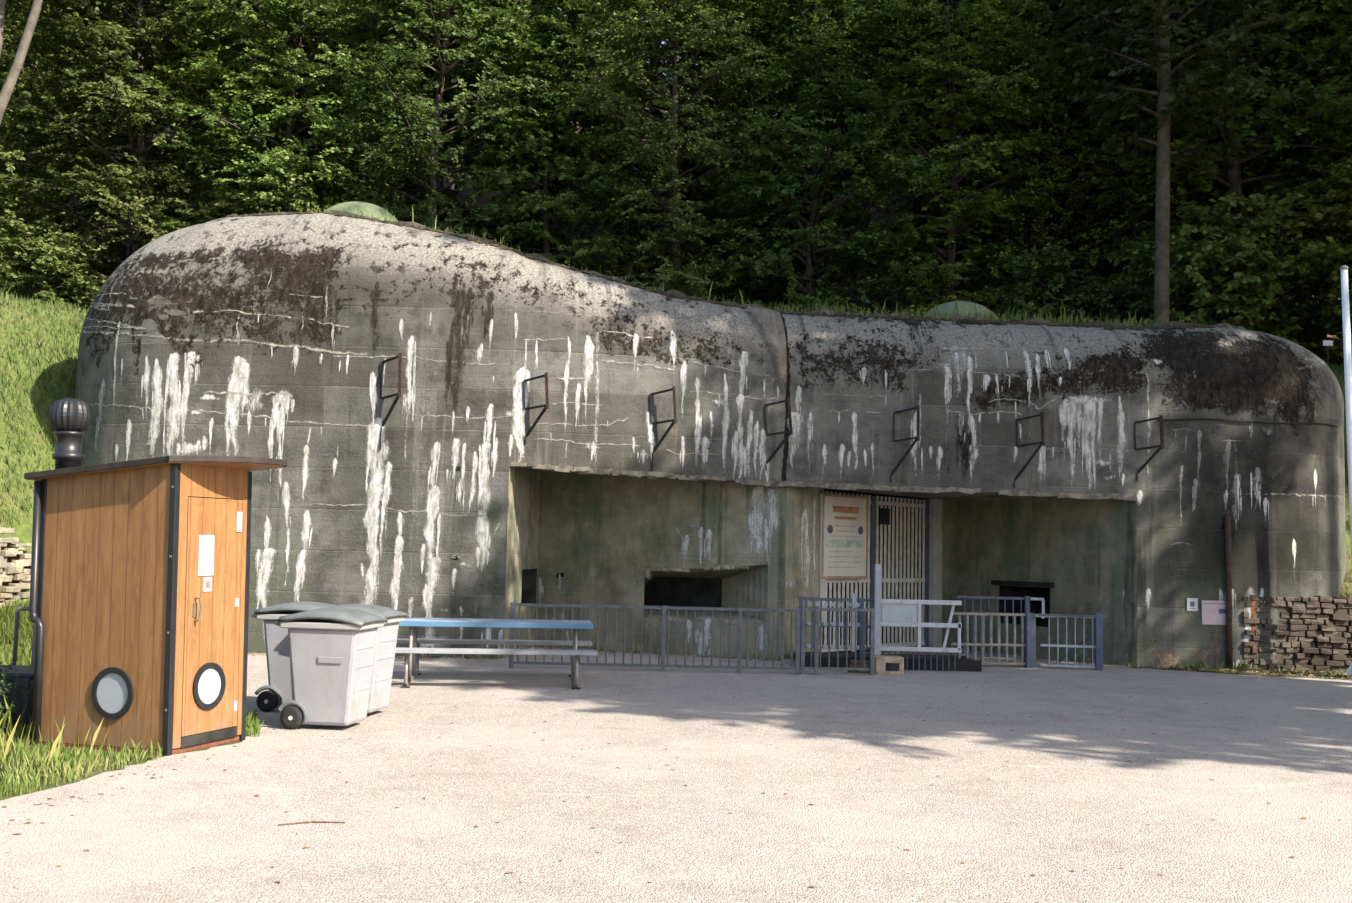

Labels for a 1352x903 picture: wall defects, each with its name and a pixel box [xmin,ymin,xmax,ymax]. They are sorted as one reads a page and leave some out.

leakage [291,268,341,370]
leakage [95,321,123,445]
leakage [115,351,313,638]
leakage [361,281,530,648]
leakage [632,412,655,462]
leakage [670,330,779,567]
leakage [763,379,874,474]
leakage [910,347,1003,482]
leakage [1014,348,1127,492]
leakage [1137,391,1151,506]
leakage [481,627,505,657]